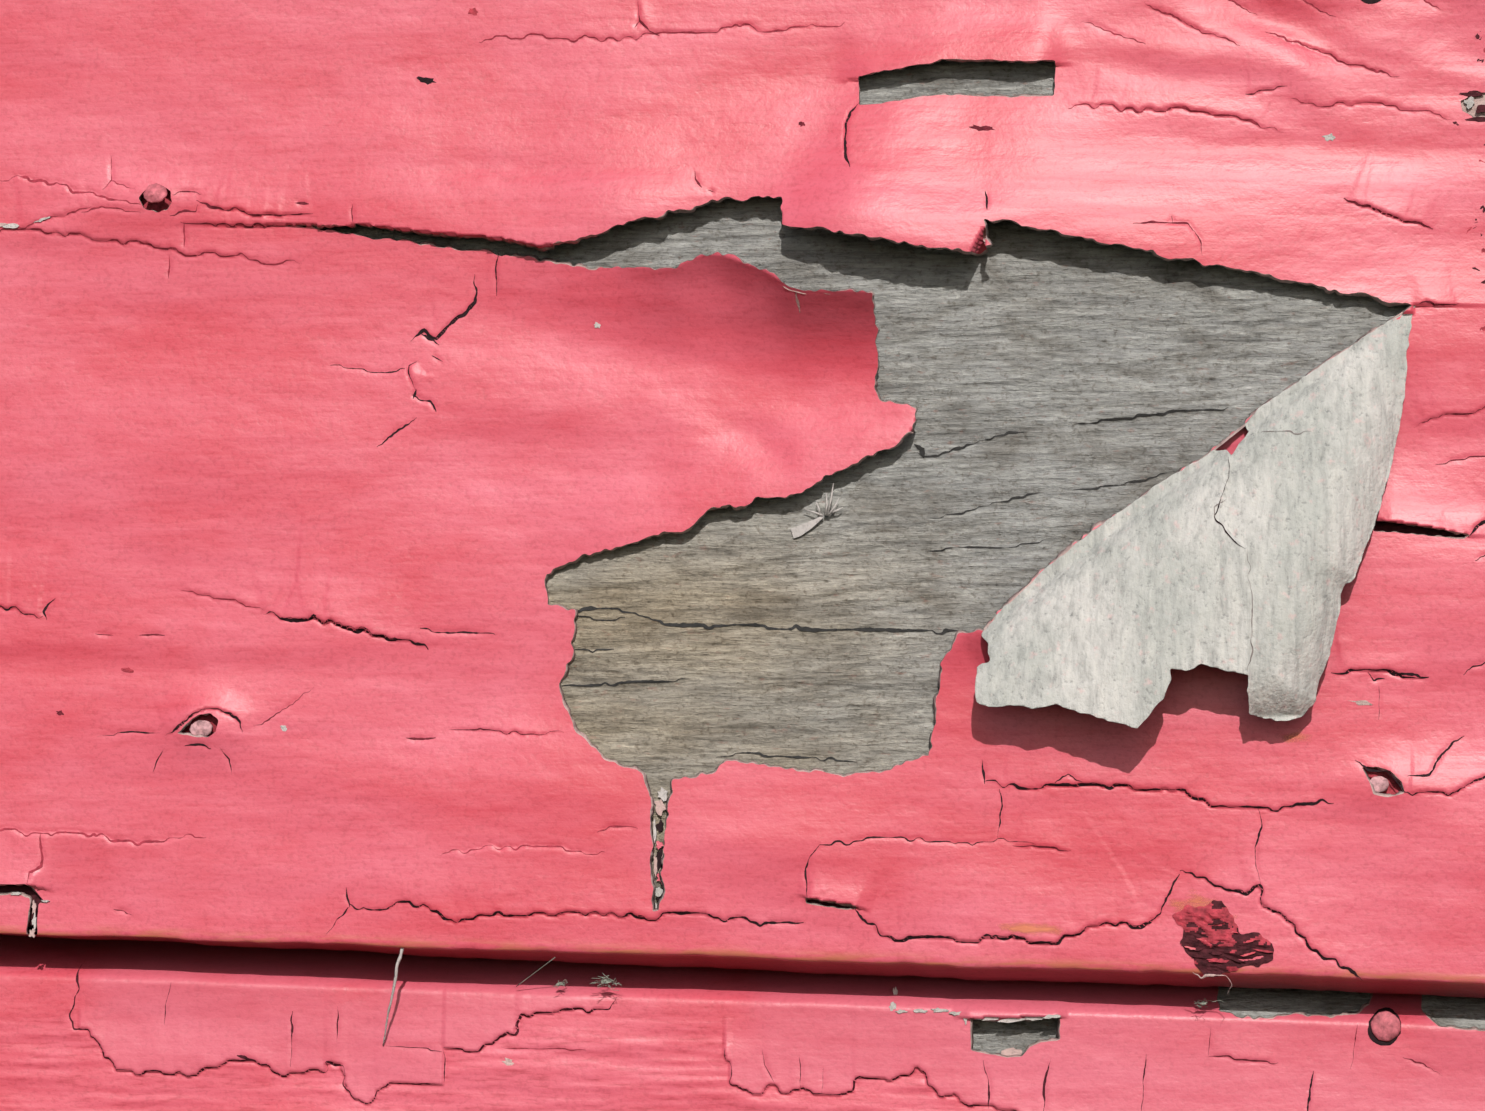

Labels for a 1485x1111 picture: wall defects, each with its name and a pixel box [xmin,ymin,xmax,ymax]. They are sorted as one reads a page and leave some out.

crack [480,8,841,43]
peeling [858,59,1056,105]
crack [0,158,312,278]
crack [330,254,499,447]
peeling [287,196,1415,911]
crack [183,590,494,649]
crack [1357,736,1485,796]
crack [327,760,1361,979]
peeling [11,892,49,938]
crack [69,962,617,1104]
peeling [889,987,1061,1058]
crack [724,1051,1051,1111]